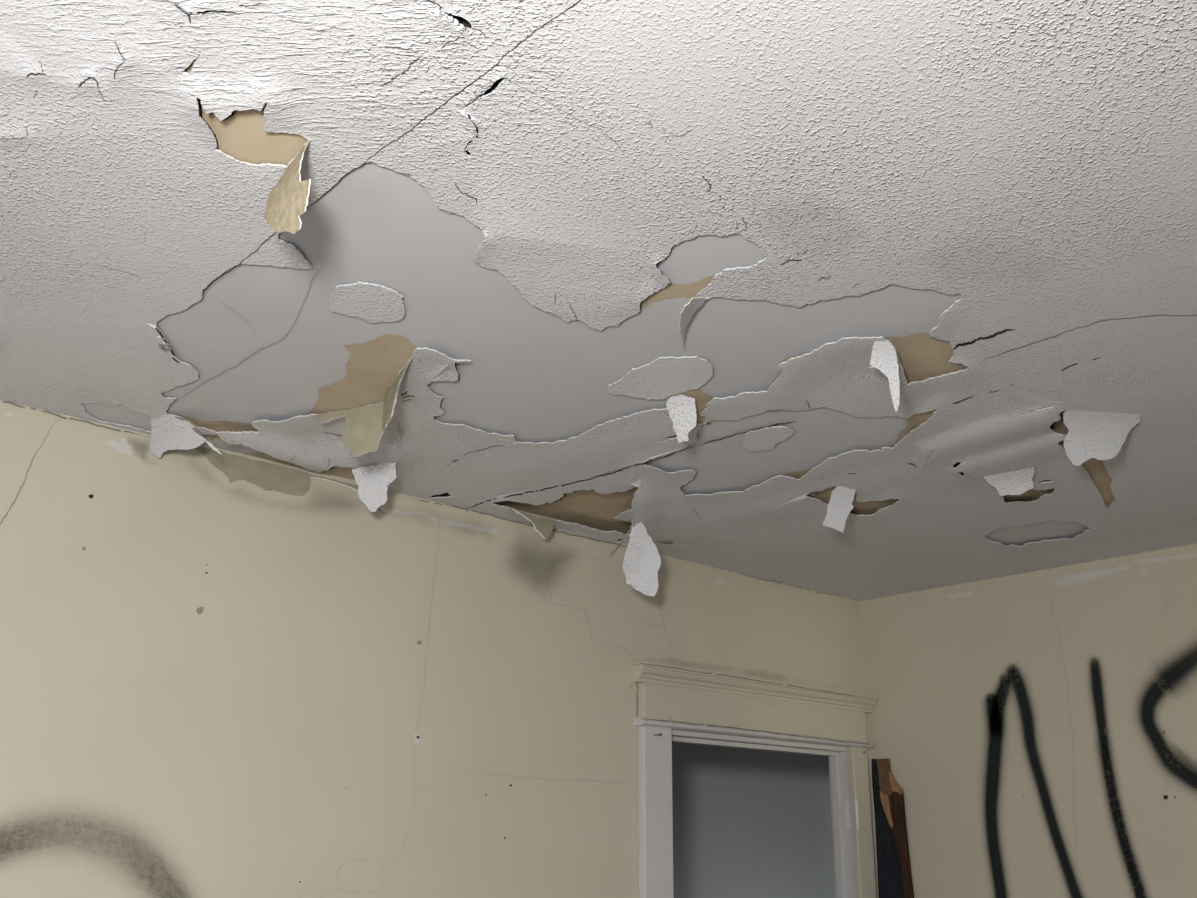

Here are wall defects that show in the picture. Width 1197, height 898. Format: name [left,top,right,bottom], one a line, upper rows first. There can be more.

crack [167,0,262,27]
crack [359,0,624,166]
crack [156,328,179,363]
crack [169,232,322,407]
peeling [157,162,968,547]
crack [952,315,1197,359]
peeling [1050,411,1069,447]
crack [0,401,151,524]
peeling [1005,480,1054,502]
peeling [1081,458,1115,507]
peeling [985,520,1089,546]